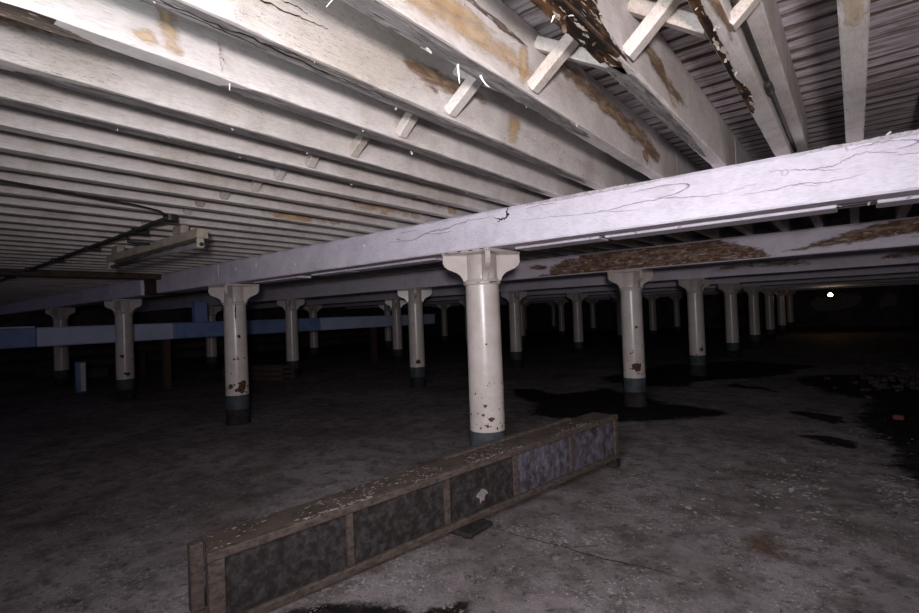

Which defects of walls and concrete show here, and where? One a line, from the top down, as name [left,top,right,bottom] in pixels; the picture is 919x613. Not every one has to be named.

crack [160,0,392,100]
peeling [140,0,661,205]
leakage [405,57,461,94]
leakage [409,0,531,81]
leakage [561,63,660,163]
peeling [530,0,706,157]
peeling [810,129,919,153]
crack [398,207,509,242]
crack [531,151,918,220]
leakage [512,374,727,423]
leakage [645,360,919,486]
leakage [286,601,411,613]